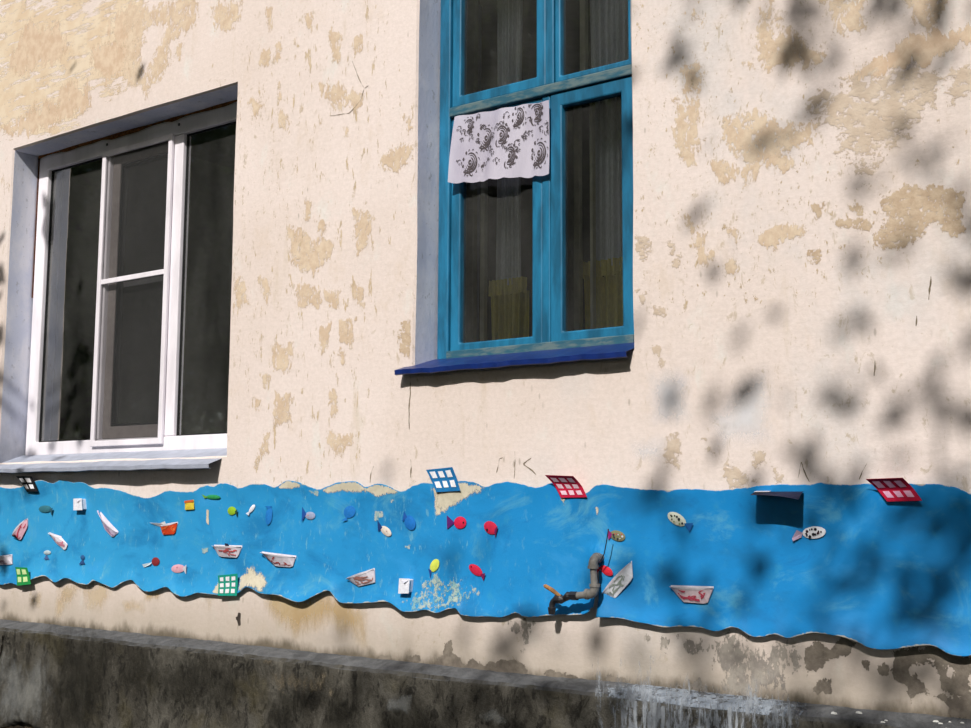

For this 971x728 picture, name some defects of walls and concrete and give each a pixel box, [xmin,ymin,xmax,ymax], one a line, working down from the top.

peeling [0,0,244,142]
peeling [236,0,385,179]
peeling [635,0,971,303]
peeling [233,98,414,478]
peeling [635,274,688,318]
damp [592,656,806,728]
peeling [646,629,856,700]
peeling [862,645,971,719]